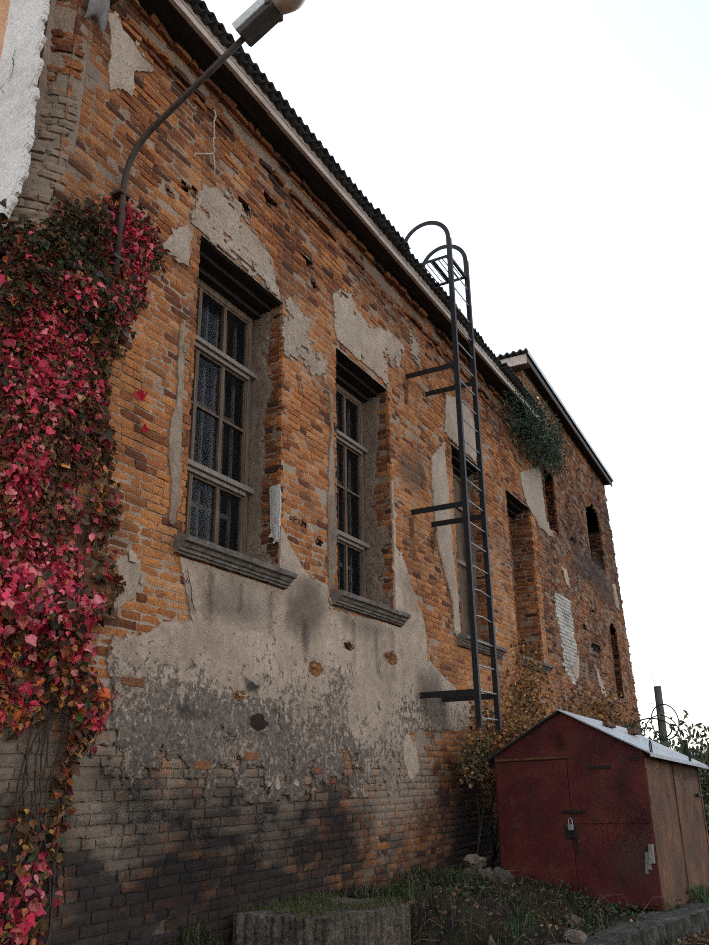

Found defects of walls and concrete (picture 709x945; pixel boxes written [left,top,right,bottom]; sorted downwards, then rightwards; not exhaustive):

flaking render [107,11,154,96]
flaking render [89,179,477,805]
flaking render [519,466,553,537]